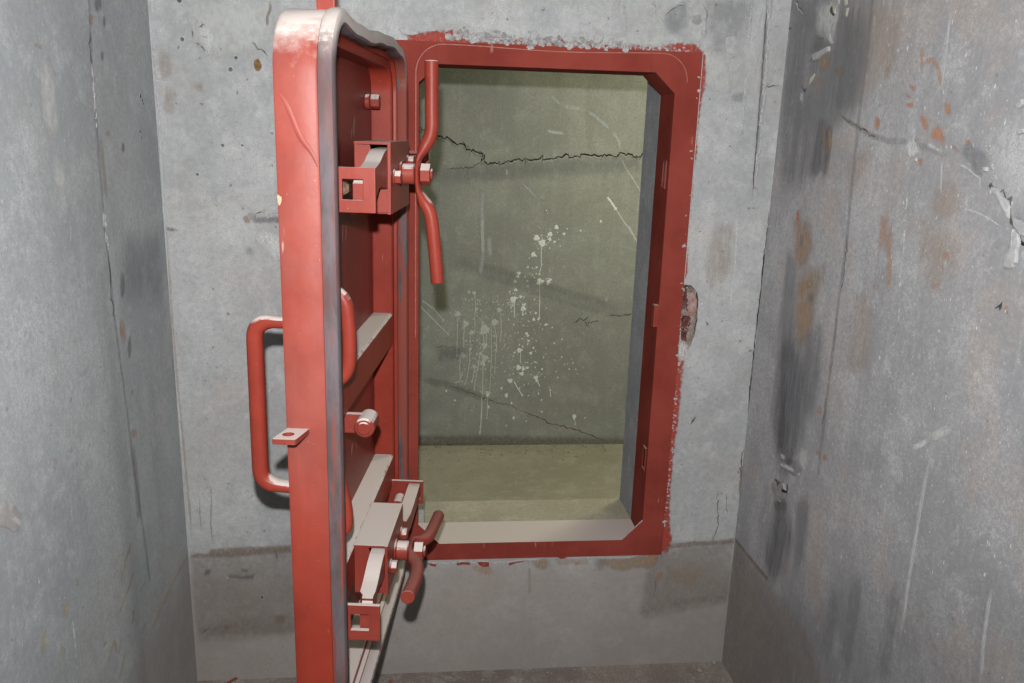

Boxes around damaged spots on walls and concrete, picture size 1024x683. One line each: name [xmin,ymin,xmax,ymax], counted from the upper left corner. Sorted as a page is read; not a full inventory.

spalling [445,0,737,99]
crack [419,127,643,170]
peeling [967,99,1024,269]
spalling [662,278,703,527]